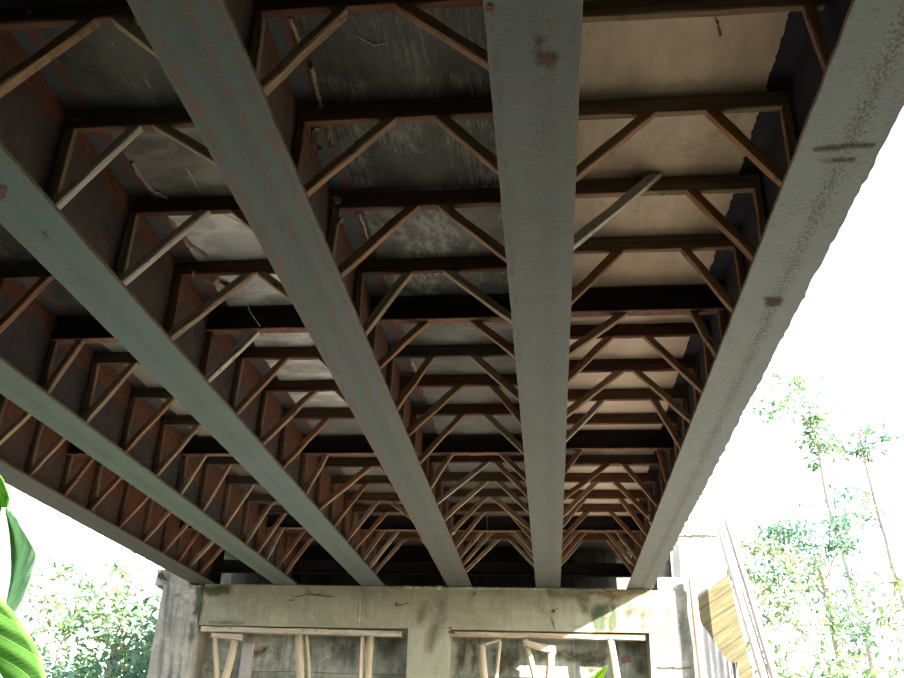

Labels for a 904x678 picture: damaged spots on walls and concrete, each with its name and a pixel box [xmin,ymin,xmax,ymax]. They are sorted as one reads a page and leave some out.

rust [814,144,875,163]
rust [764,298,782,307]
damp [574,592,645,632]